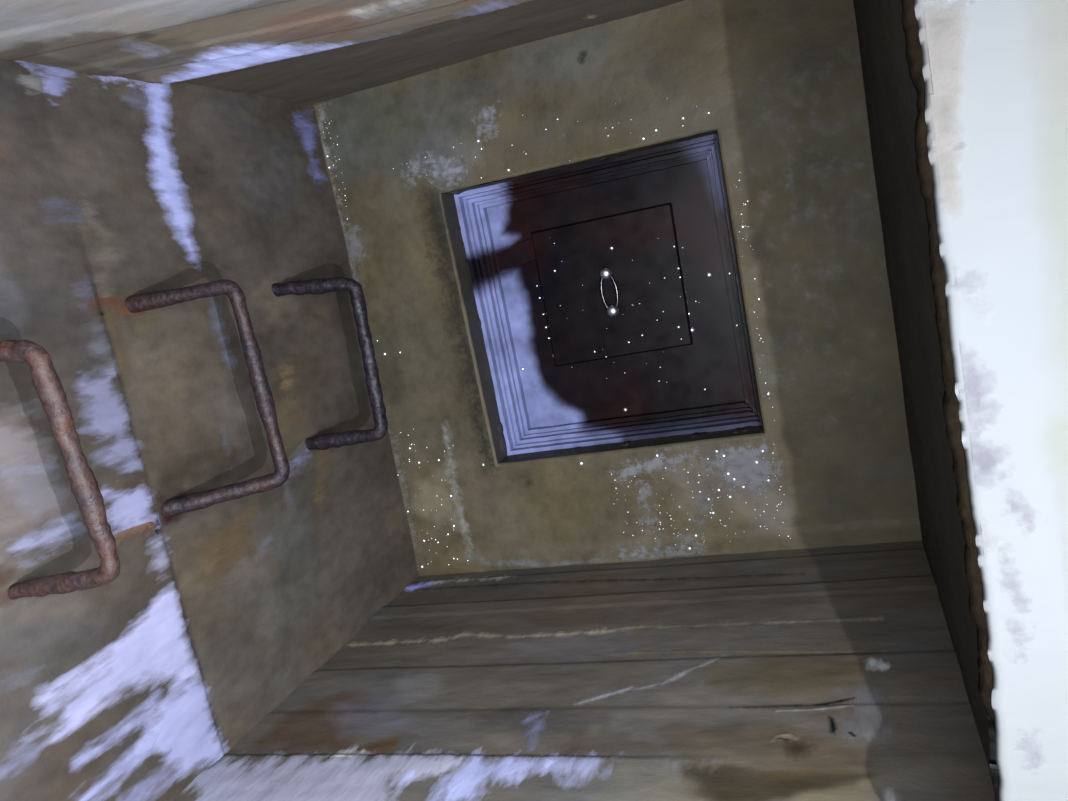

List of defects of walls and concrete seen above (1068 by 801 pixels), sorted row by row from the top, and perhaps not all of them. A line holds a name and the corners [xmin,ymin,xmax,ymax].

efflorescence [18,61,74,96]
water stain [101,39,379,282]
efflorescence [613,439,783,560]
water stain [0,584,600,801]